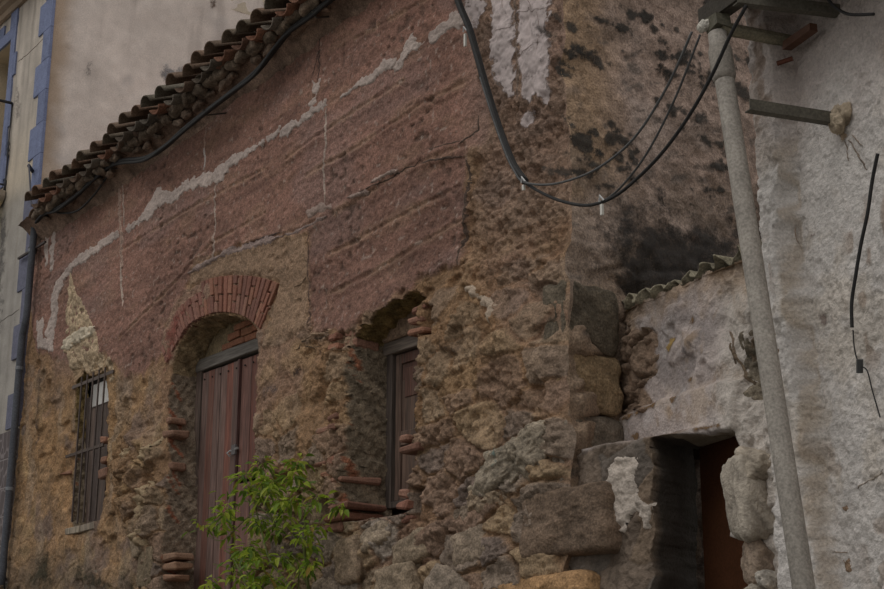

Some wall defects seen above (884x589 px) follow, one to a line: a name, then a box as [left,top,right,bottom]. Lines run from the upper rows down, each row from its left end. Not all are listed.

flaking render [340,0,552,128]
leakage [555,43,611,78]
leakage [621,5,713,87]
leakage [735,82,750,101]
flaking render [36,78,327,382]
crack [187,107,331,350]
crack [346,115,480,265]
leakage [542,120,640,190]
leakage [597,198,738,294]
leakage [697,134,728,172]
flaking render [464,285,498,325]
spalling [738,330,763,400]